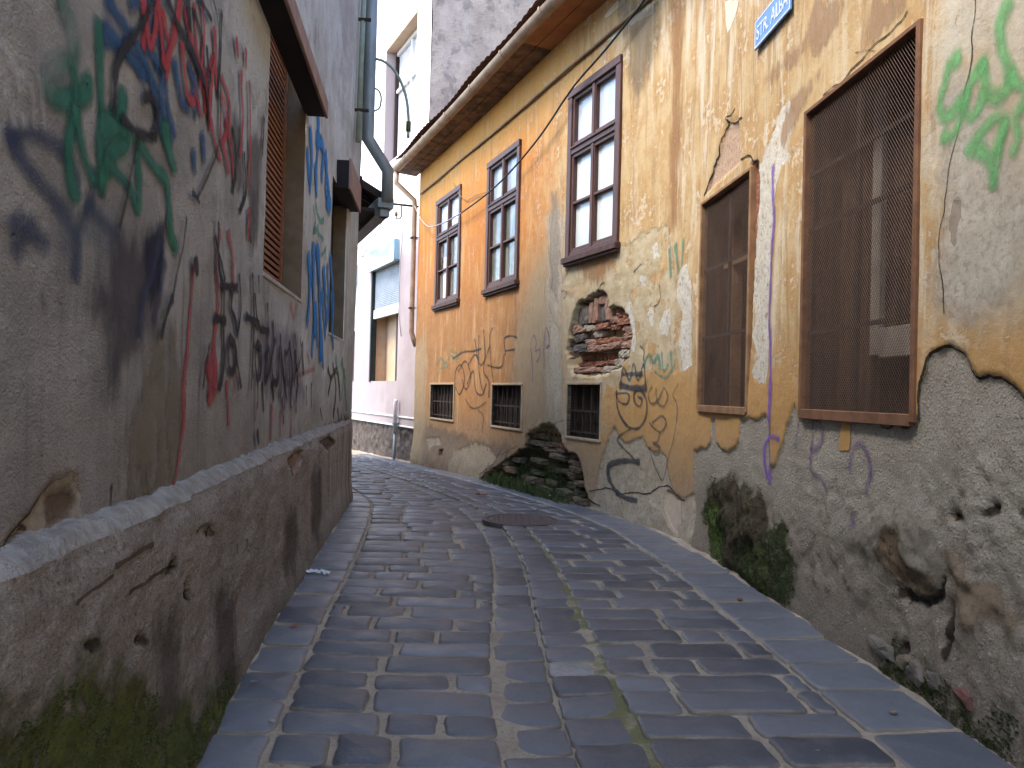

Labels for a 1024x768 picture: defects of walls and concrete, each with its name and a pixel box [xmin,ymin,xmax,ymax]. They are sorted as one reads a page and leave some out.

crack [823,11,907,95]
crack [963,0,976,96]
flaking render [561,225,692,396]
peeling [749,101,794,384]
crack [938,132,958,314]
flaking render [4,471,82,546]
flaking render [319,437,335,451]
flaking render [427,344,1024,768]